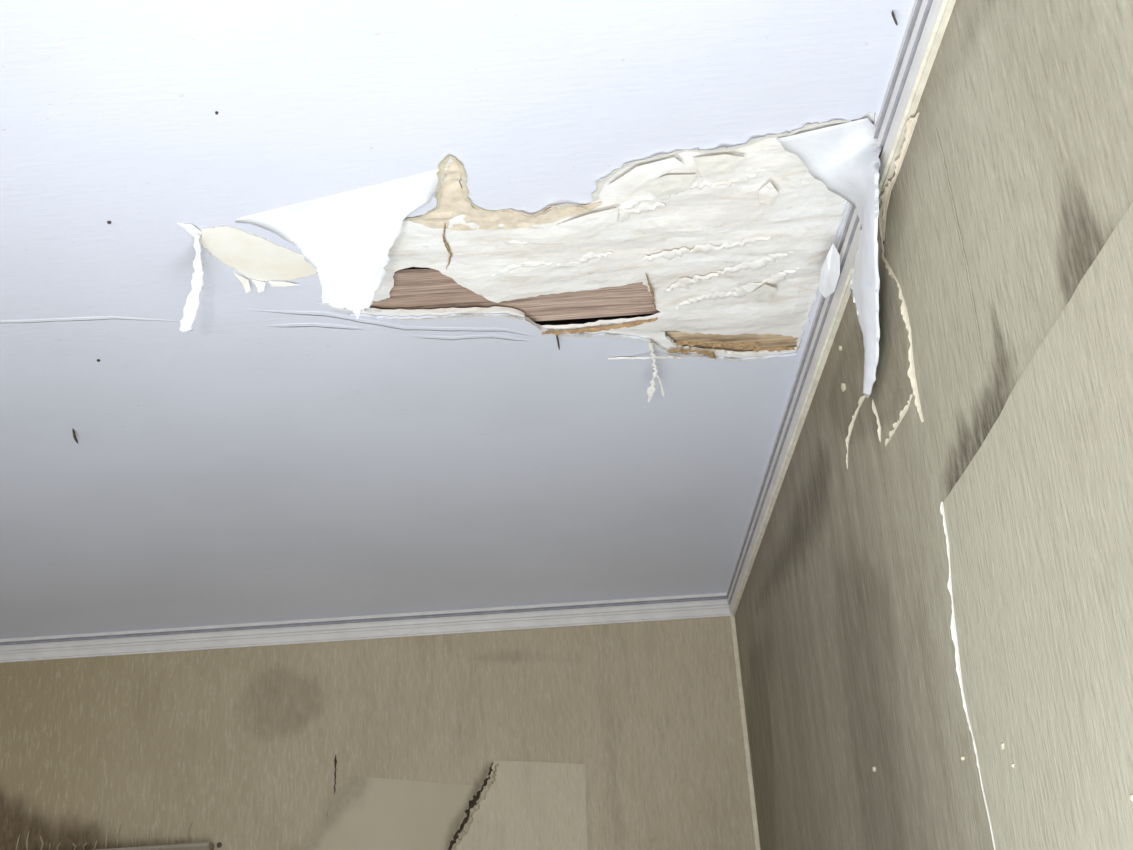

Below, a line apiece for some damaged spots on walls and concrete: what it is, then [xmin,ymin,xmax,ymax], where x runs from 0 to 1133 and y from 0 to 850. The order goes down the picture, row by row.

spalling [177,113,882,398]
water stain [0,801,151,850]